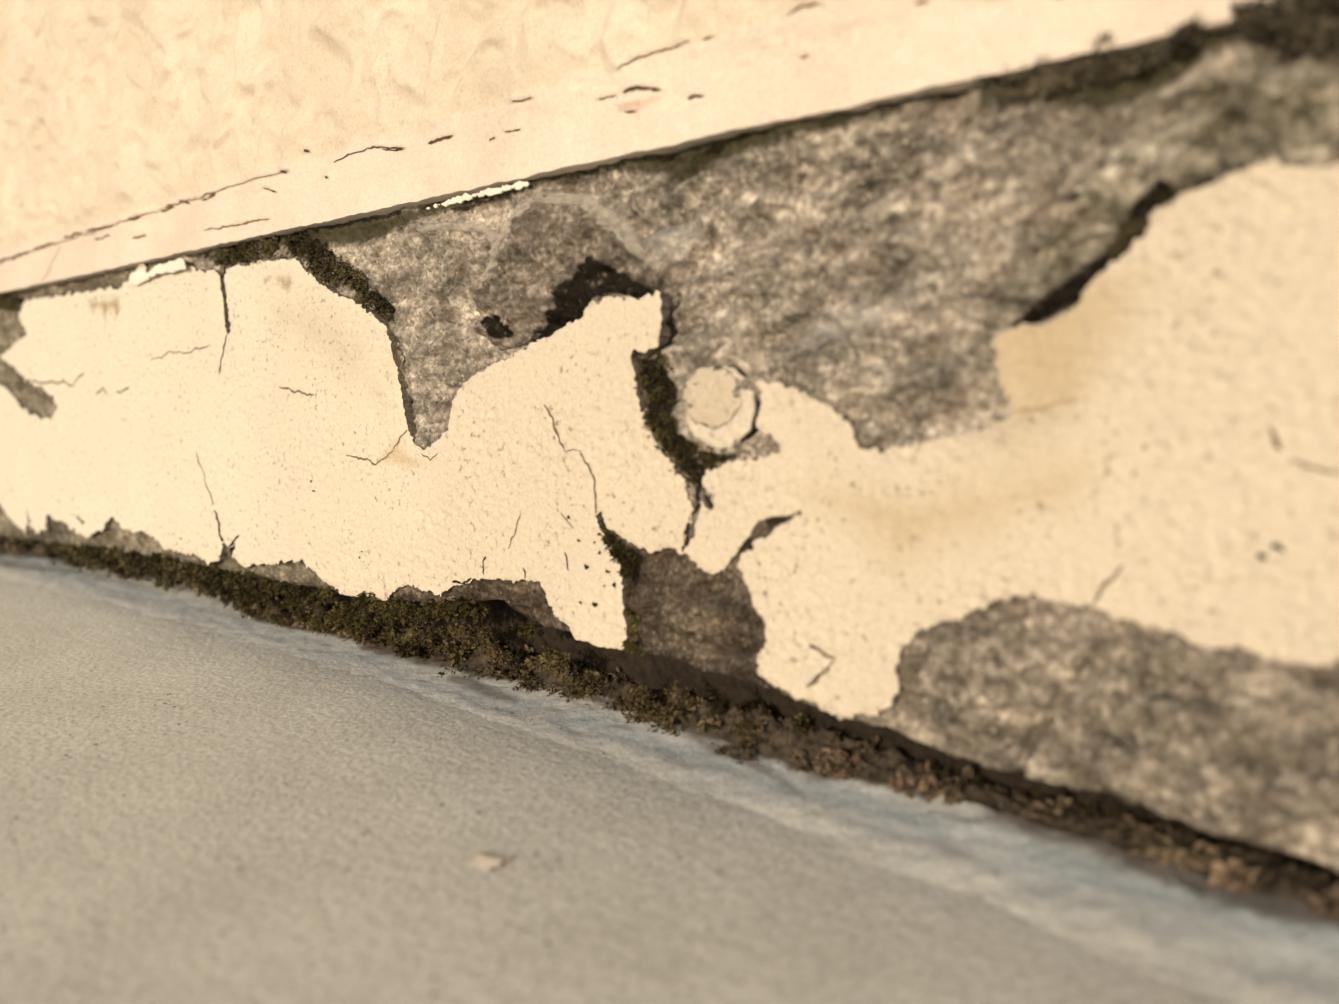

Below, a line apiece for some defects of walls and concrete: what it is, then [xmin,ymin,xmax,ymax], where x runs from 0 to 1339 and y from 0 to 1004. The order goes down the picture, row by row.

crack [489,97,532,141]
crack [0,135,453,280]
crack [30,373,129,395]
crack [151,266,231,375]
peeling [0,36,1339,707]
crack [196,453,239,555]
crack [452,513,526,584]
crack [543,404,597,571]
peeling [845,595,1339,873]